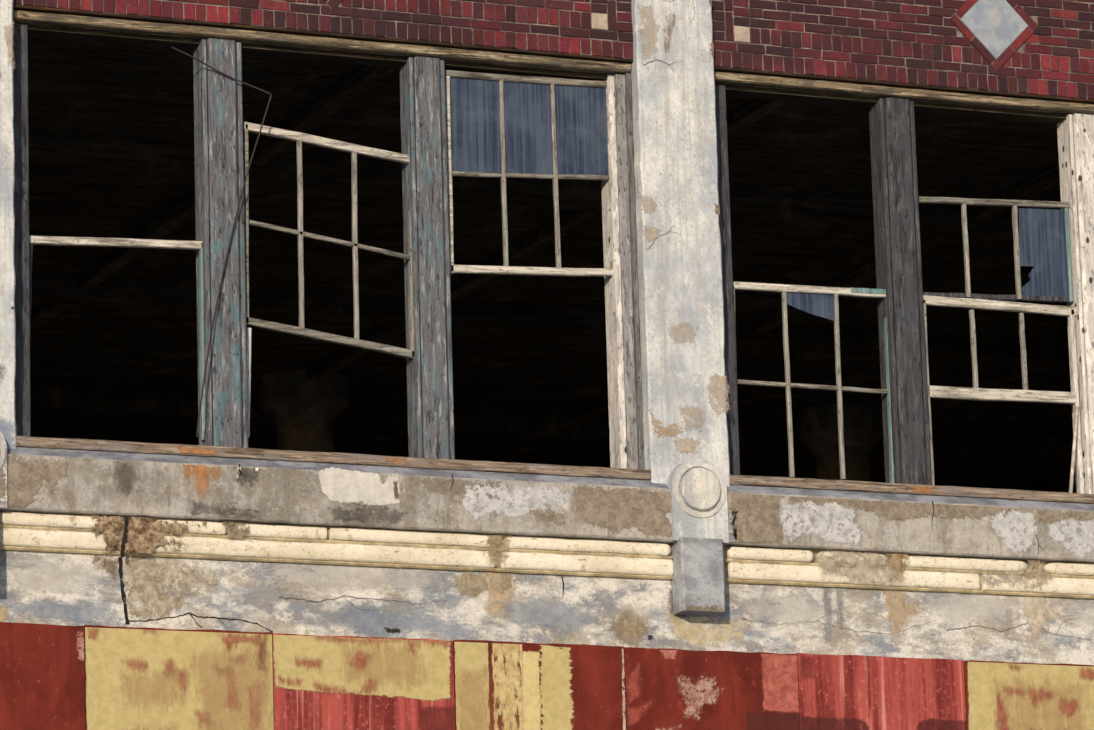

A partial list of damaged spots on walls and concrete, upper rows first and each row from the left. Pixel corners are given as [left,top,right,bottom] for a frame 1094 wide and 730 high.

rust [179,447,220,490]
peeling [649,373,730,455]
spalling [90,514,217,623]
crack [118,518,273,633]
peeling [454,483,672,597]
peeling [723,493,1094,589]